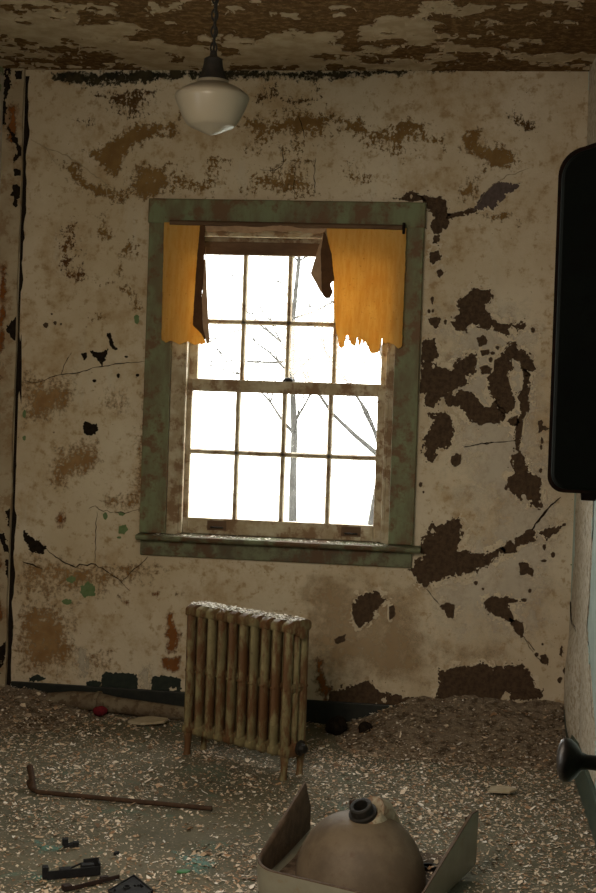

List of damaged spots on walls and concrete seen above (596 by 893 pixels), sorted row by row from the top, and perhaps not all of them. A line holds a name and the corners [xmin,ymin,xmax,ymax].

water stain [51,70,201,88]
peeling [0,0,596,207]
water stain [224,70,415,83]
water stain [57,112,233,205]
flaking render [387,179,523,278]
water stain [22,371,76,421]
flaking render [419,282,549,510]
water stain [49,438,104,487]
flaking render [23,530,47,554]
water stain [15,555,159,677]
flaking render [334,585,396,644]
flaking render [403,493,596,755]